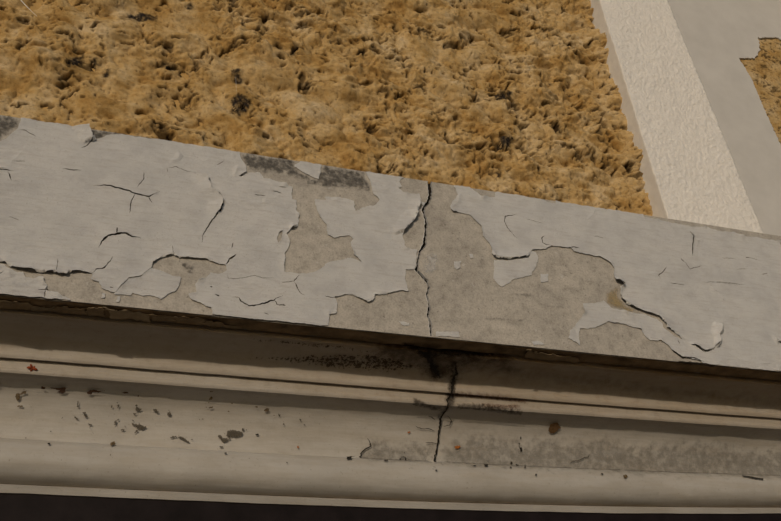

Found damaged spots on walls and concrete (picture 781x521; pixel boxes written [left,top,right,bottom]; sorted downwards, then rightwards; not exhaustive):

peeling [0,115,32,168]
peeling [72,124,152,143]
crack [93,175,160,211]
peeling [643,215,781,241]
crack [95,228,134,270]
peeling [240,152,702,363]
peeling [0,254,227,316]
crack [414,181,491,462]
peeling [691,323,724,351]
water stain [256,341,418,372]
peeling [718,359,778,371]
water stain [458,404,521,415]